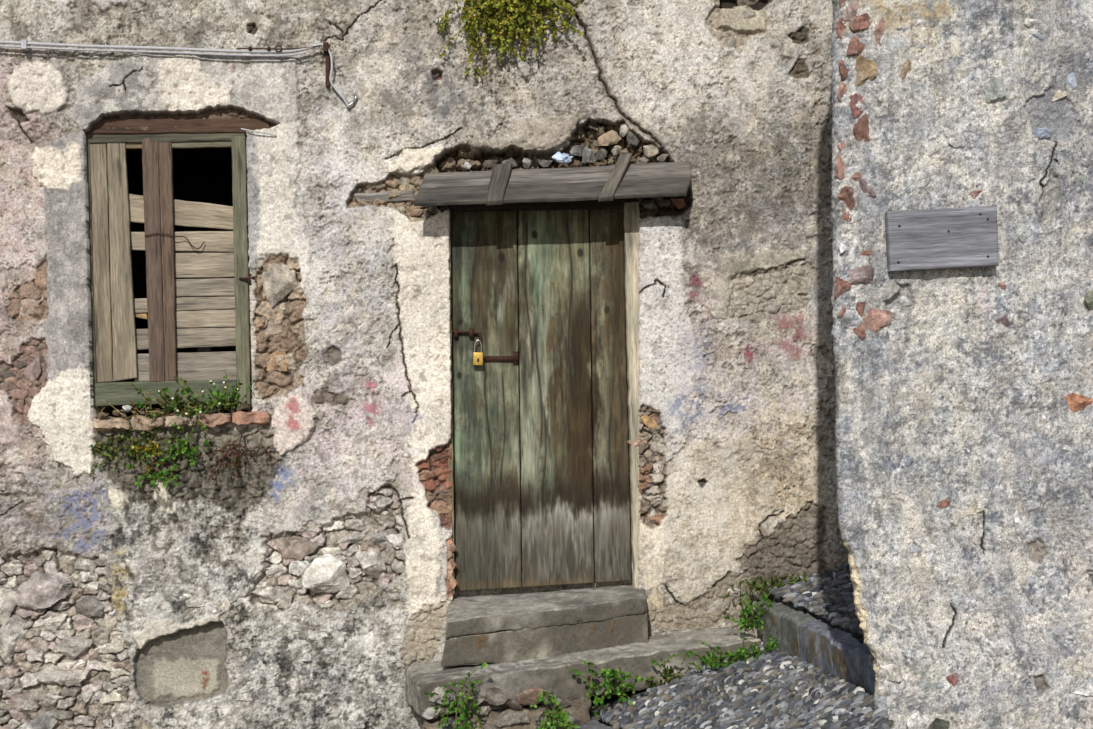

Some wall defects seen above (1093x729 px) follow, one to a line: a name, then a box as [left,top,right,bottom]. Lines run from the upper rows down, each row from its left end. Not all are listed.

crack [325,0,382,42]
crack [564,0,672,162]
spalling [348,121,669,221]
crack [1039,137,1060,194]
flaking render [0,339,48,423]
flaking render [254,253,308,400]
crack [387,265,419,423]
flaking render [627,405,668,527]
flaking render [399,443,457,667]
crack [979,512,987,554]
flaking render [0,548,132,729]
crack [942,604,957,647]